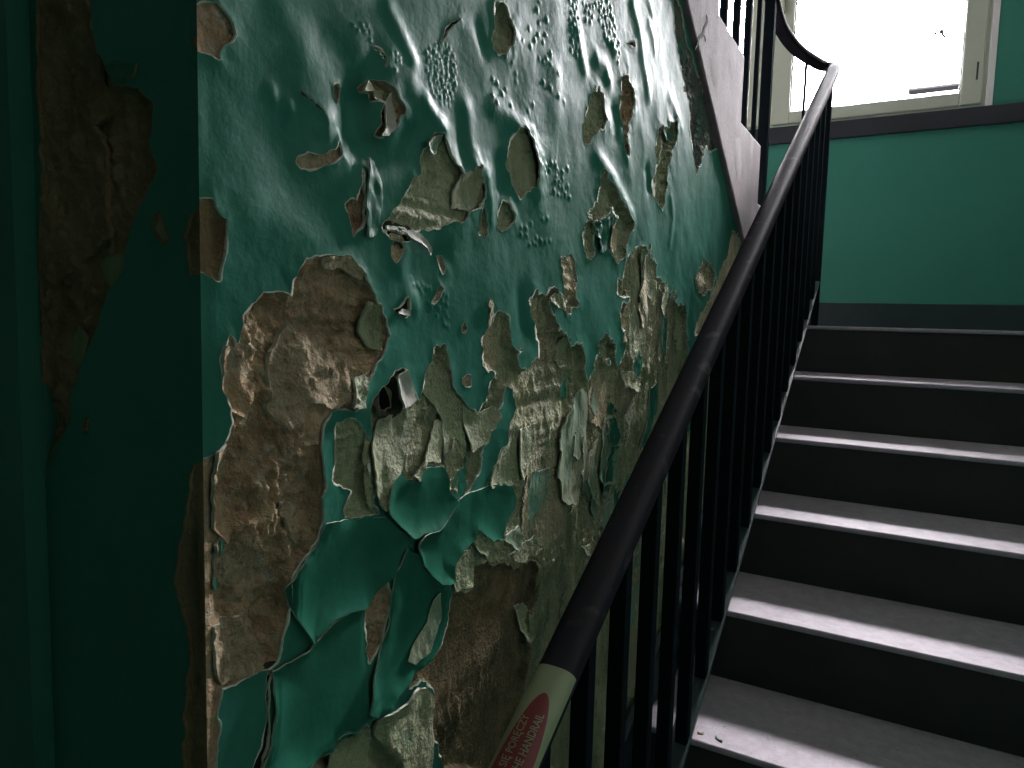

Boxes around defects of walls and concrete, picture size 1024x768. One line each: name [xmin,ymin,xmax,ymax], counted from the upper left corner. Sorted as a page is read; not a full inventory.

peeling [190,0,238,61]
flaking render [35,0,158,476]
peeling [357,79,407,139]
peeling [344,125,541,263]
peeling [583,74,636,160]
peeling [651,118,679,211]
peeling [174,168,689,768]
peeling [681,420,691,567]
peeling [702,376,710,510]